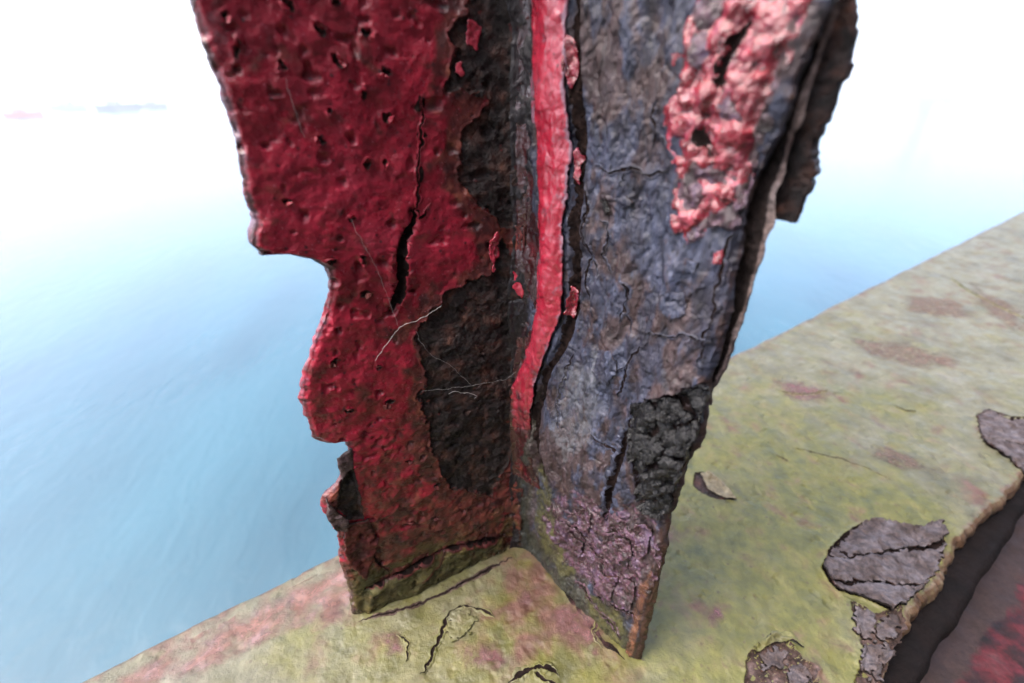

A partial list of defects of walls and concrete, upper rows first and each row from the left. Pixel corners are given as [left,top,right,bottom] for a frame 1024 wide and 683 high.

crack [382,95,431,311]
crack [531,0,786,525]
peeling [541,0,860,610]
peeling [976,408,1024,472]
spalling [326,448,378,580]
crack [358,532,513,675]
crack [508,661,560,683]
crack [564,578,640,660]
peeling [823,517,950,683]